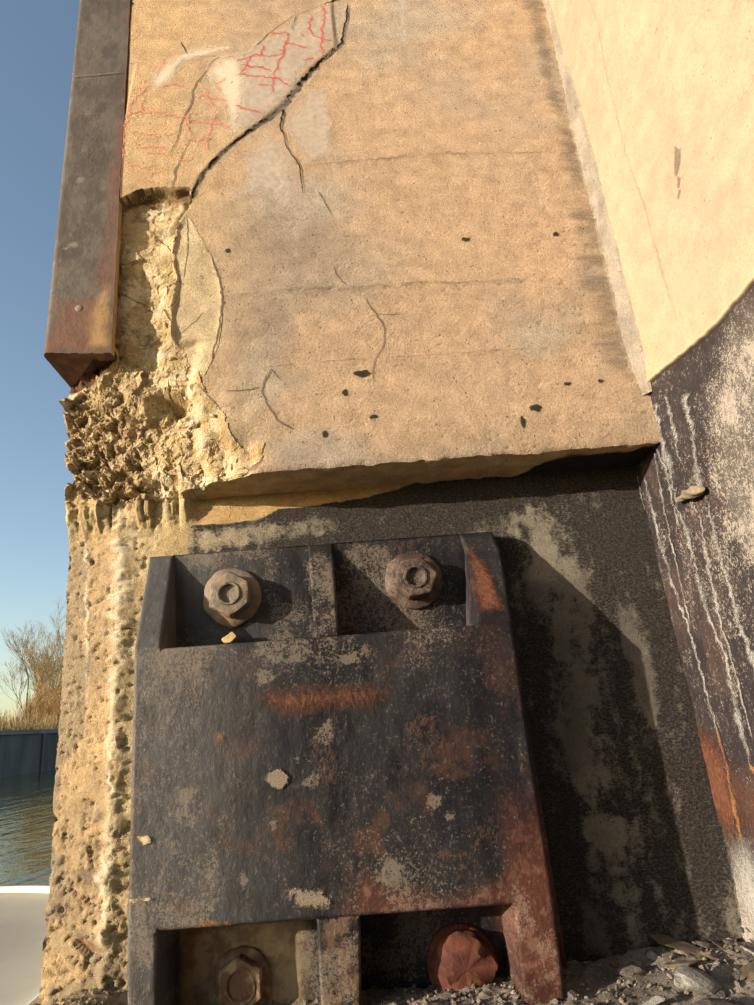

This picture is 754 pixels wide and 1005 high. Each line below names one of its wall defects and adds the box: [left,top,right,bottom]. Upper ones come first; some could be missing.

crack [170,0,348,276]
spalling [68,186,264,504]
crack [182,260,224,359]
corrosion [470,552,499,609]
corrosion [269,691,366,709]
corrosion [699,730,742,841]
efflorescence [737,854,754,925]